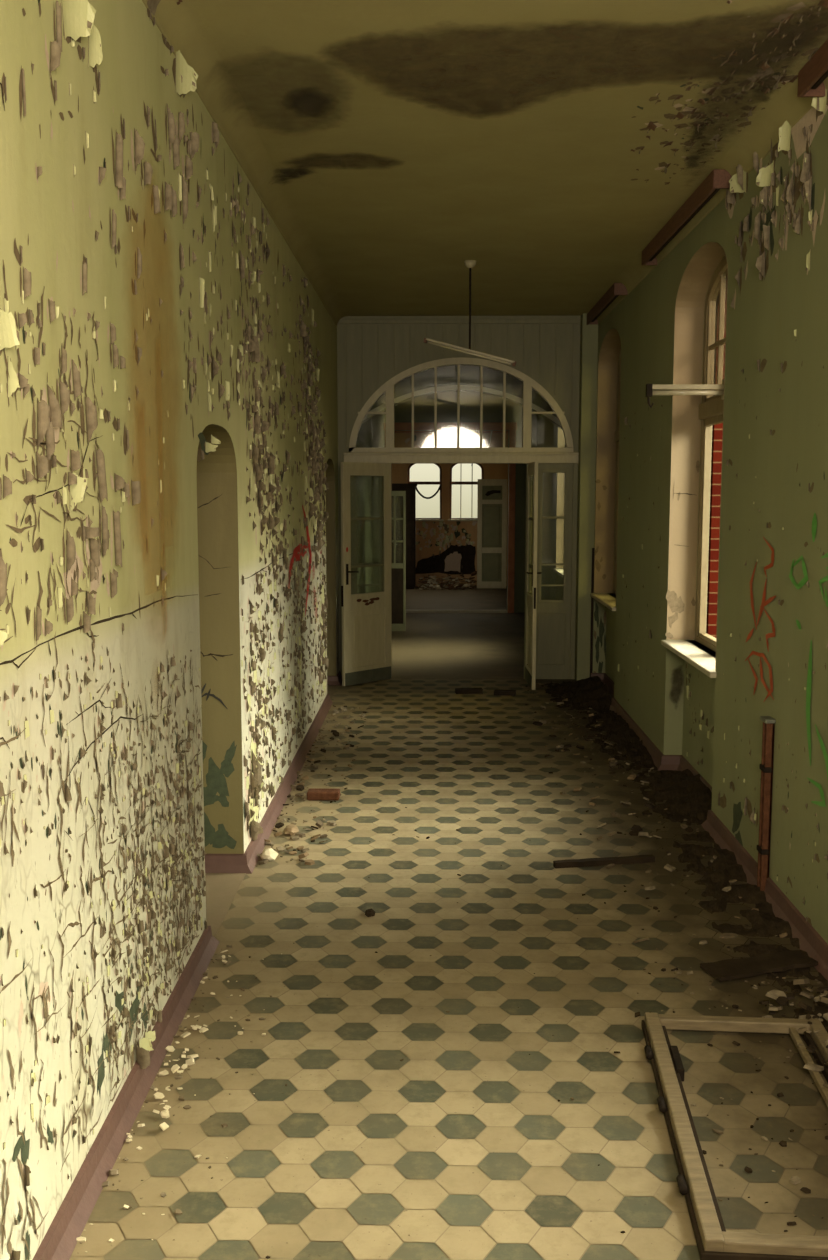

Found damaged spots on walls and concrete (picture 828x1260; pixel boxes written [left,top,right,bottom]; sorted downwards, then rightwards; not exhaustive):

damp [278,154,397,181]
damp [329,5,828,166]
peeling [630,0,828,185]
peeling [725,88,828,309]
crack [0,553,293,669]